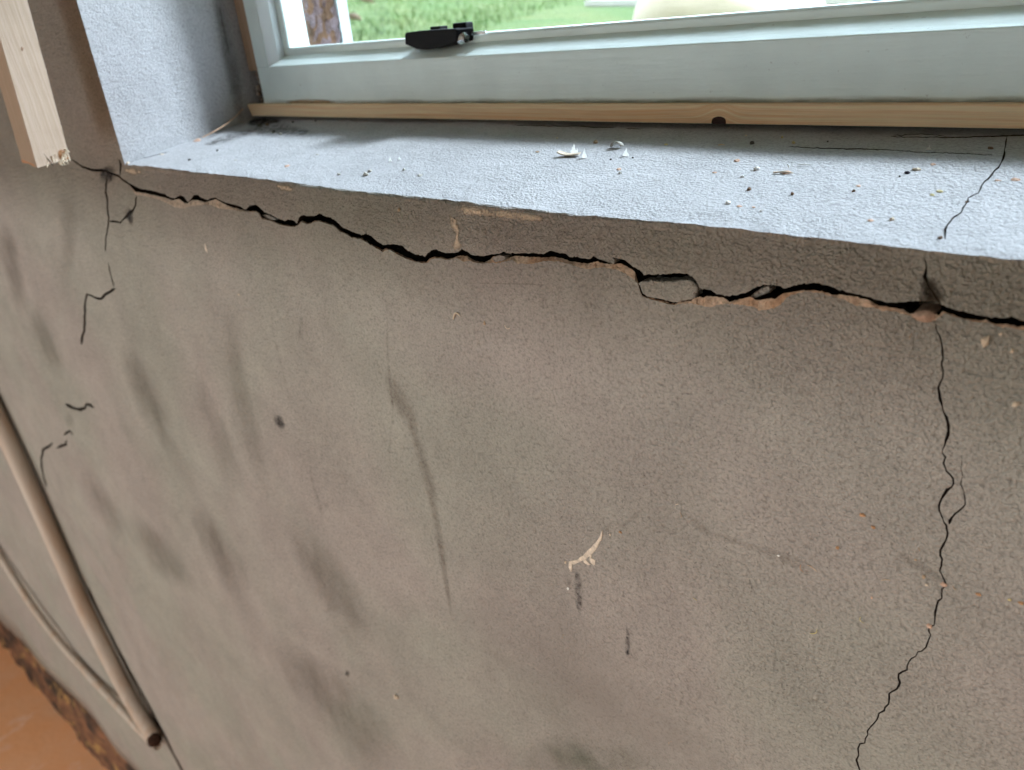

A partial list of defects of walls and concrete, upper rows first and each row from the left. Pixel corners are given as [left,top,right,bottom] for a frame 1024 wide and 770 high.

crack [789,133,1024,238]
crack [40,403,94,487]
crack [72,152,1024,770]